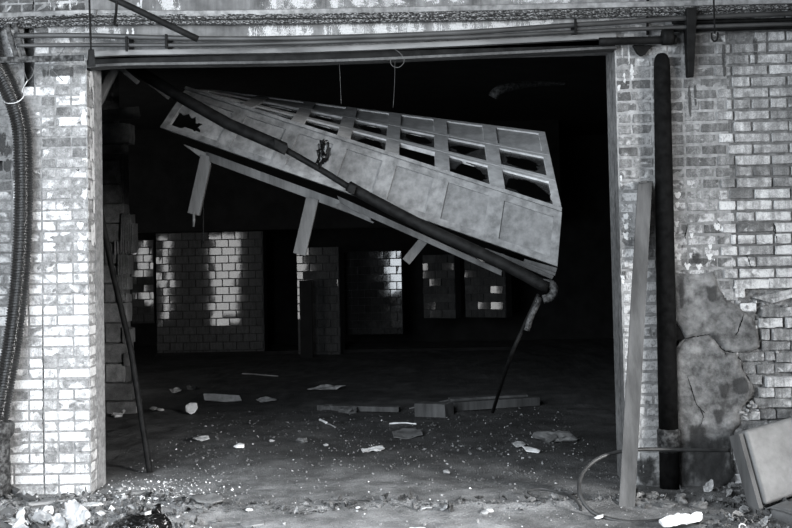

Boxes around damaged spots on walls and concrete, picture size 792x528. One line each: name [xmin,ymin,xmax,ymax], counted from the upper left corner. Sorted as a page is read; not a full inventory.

peeling [262,0,314,9]
peeling [329,0,405,8]
peeling [248,24,313,36]
peeling [324,19,553,35]
spalling [676,324,684,346]
crack [684,315,744,356]
spalling [733,278,792,430]